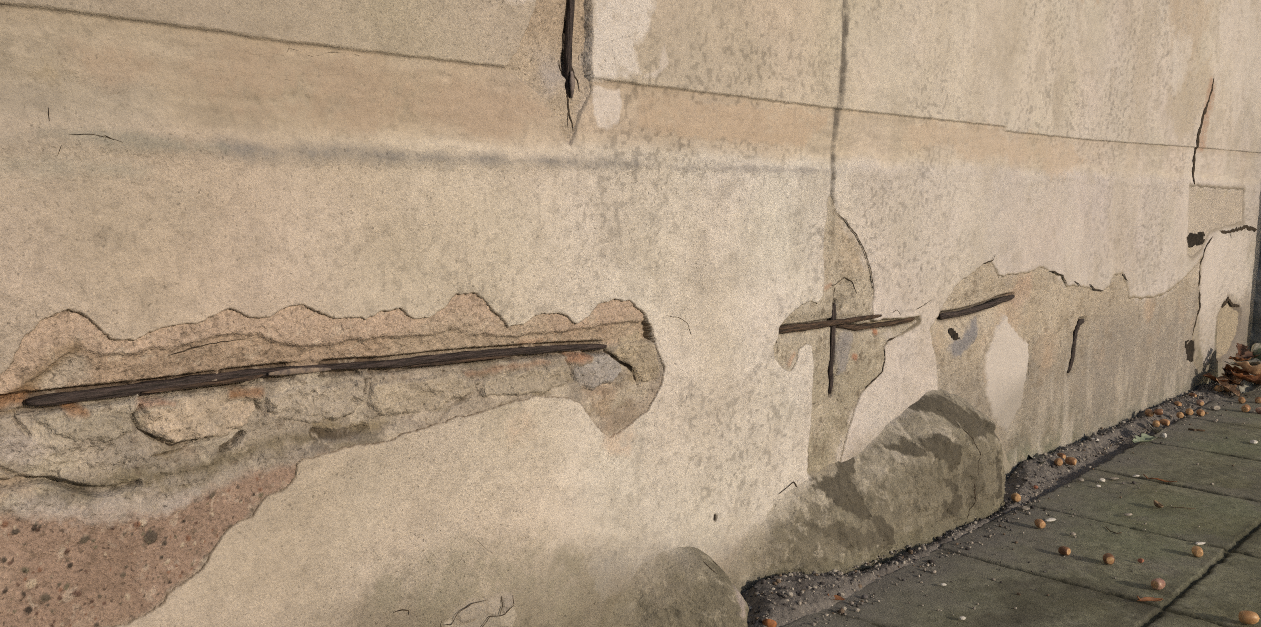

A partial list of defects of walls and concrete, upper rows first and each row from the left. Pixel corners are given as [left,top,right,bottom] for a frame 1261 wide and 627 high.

peeling [41,0,590,150]
crack [1192,80,1214,184]
spalling [0,293,663,627]
spalling [773,196,916,474]
peeling [930,186,1243,470]